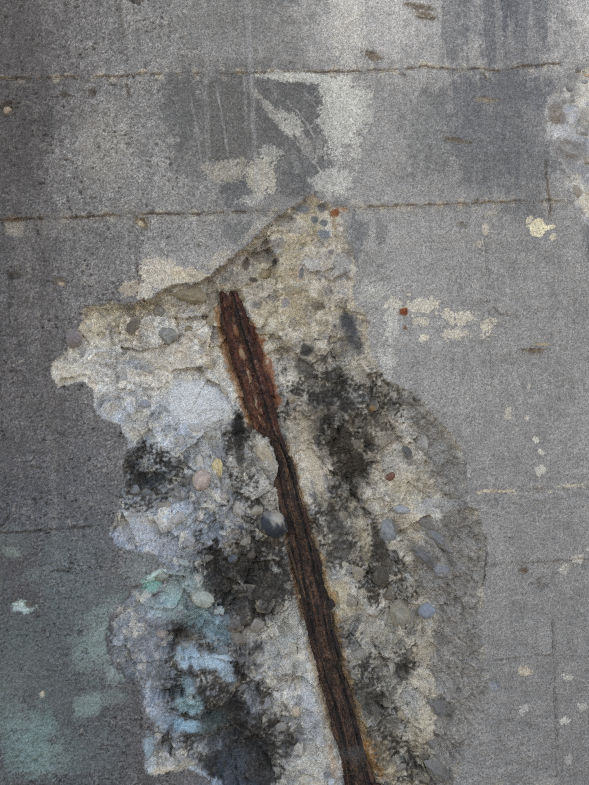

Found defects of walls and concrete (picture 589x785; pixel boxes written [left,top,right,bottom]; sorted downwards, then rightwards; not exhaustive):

spalling [51,0,515,785]
rust [211,291,388,785]
peeling [532,435,548,477]
spalling [545,58,589,272]